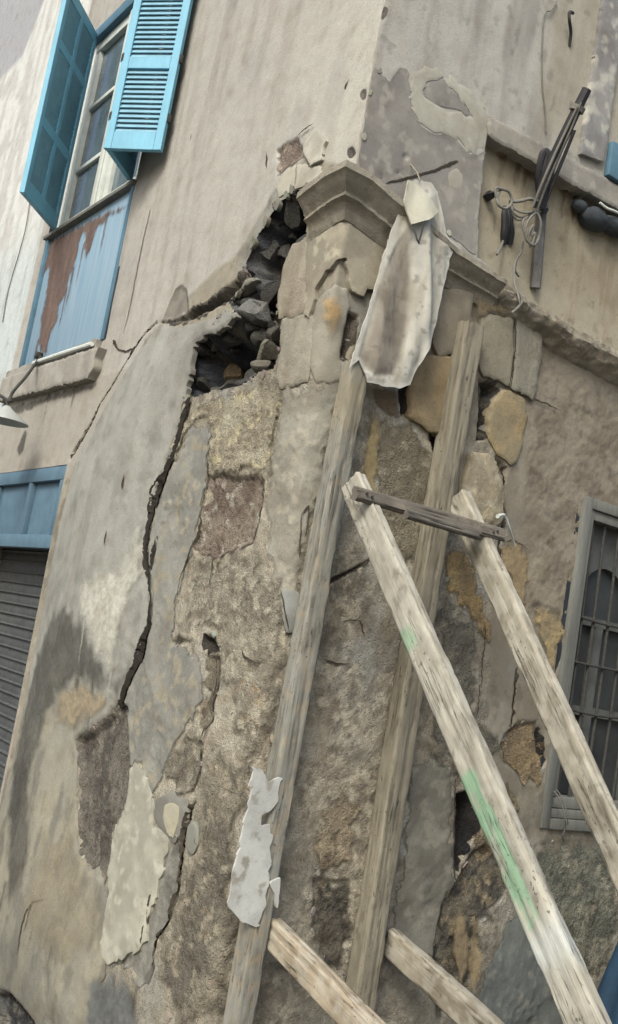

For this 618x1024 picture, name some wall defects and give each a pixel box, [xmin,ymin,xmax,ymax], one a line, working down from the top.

peeling [347,65,489,254]
corrosion [34,208,121,359]
crack [117,396,191,708]
spalling [76,129,385,1022]
spalling [500,720,546,812]
spalling [433,791,505,992]